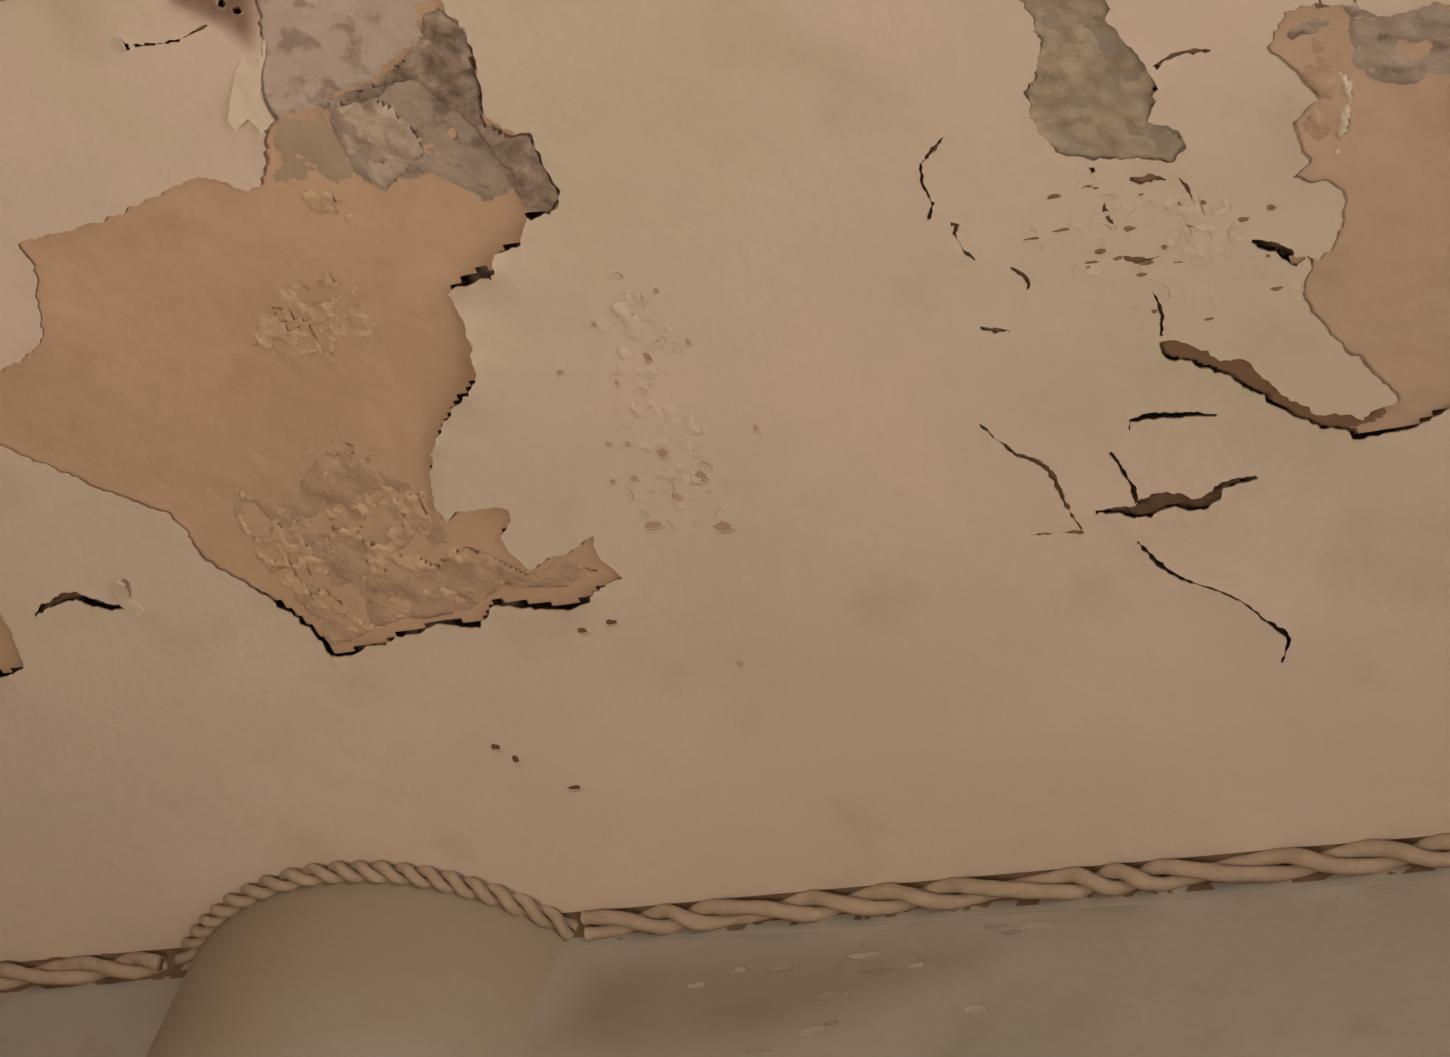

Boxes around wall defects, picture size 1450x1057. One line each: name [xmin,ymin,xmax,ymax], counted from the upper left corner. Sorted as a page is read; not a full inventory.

peeling [1021,0,1186,170]
peeling [0,0,622,654]
crack [919,137,975,259]
crack [981,325,1009,333]
crack [1011,164,1386,434]
peeling [1267,1,1450,433]
peeling [0,614,23,673]
crack [38,581,145,617]
crack [980,416,1291,660]